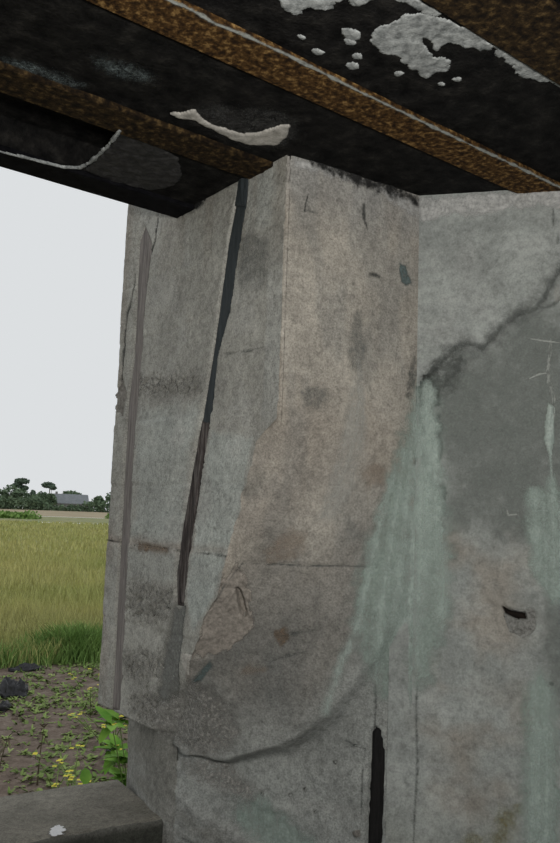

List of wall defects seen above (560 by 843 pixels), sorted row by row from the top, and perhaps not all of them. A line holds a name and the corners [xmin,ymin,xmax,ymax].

peeling [279,0,371,16]
peeling [341,0,560,87]
peeling [170,105,293,146]
crack [122,222,158,380]
crack [435,270,560,378]
crack [529,339,560,416]
water stain [354,315,560,697]
spalling [181,563,254,675]
water stain [523,676,560,843]